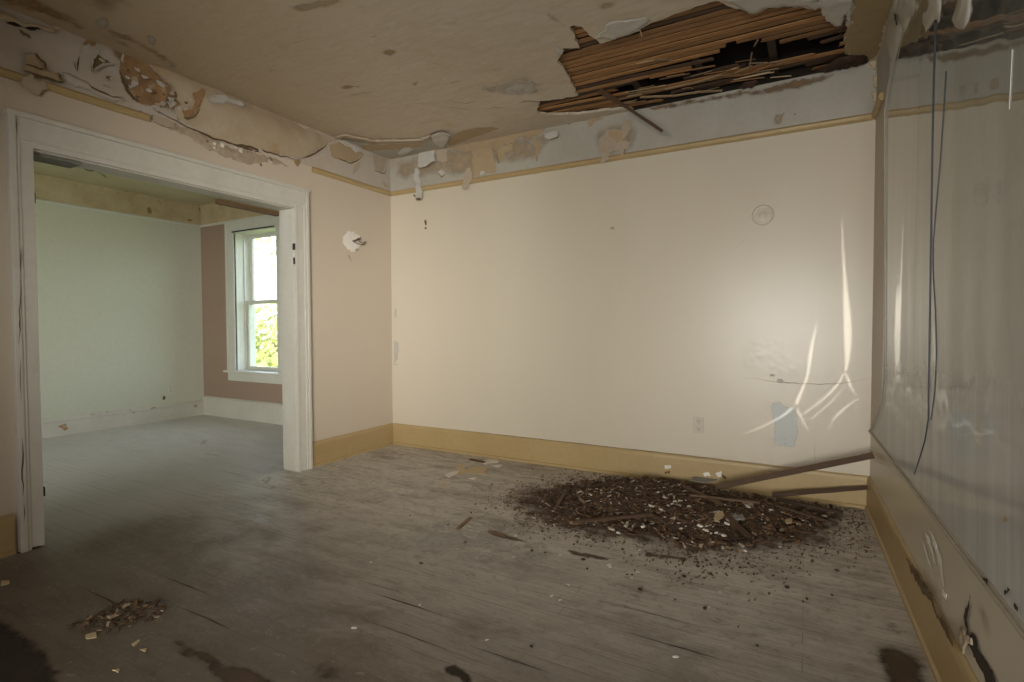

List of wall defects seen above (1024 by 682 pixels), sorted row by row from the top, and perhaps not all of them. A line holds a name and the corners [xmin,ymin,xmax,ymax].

peeling [818,0,893,102]
peeling [59,39,287,167]
peeling [320,127,499,200]
spalling [343,231,366,252]
peeling [922,529,947,601]